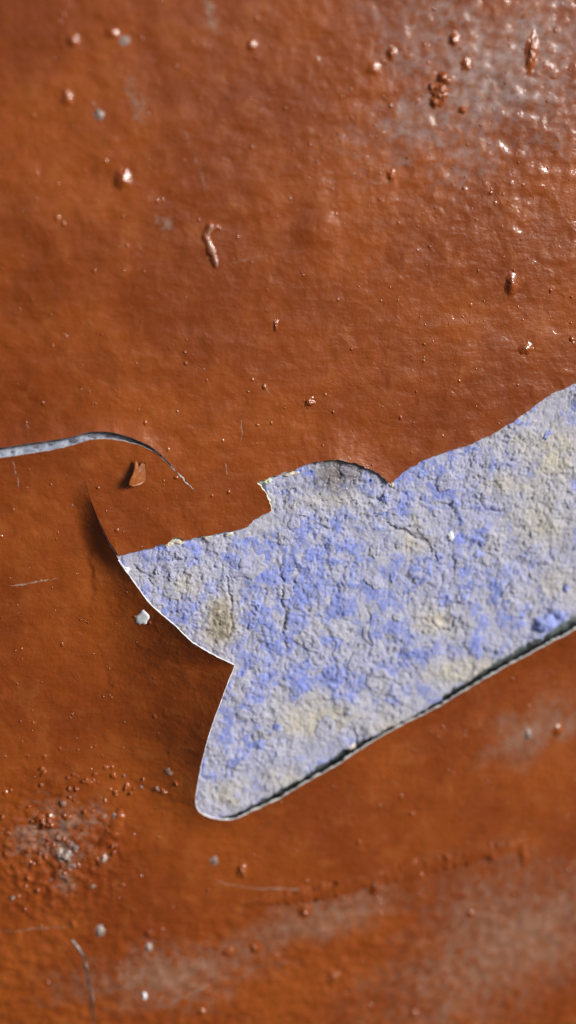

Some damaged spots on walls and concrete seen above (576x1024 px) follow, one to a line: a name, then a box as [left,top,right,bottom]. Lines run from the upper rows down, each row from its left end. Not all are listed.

crack [0,431,193,489]
peeling [23,383,576,895]